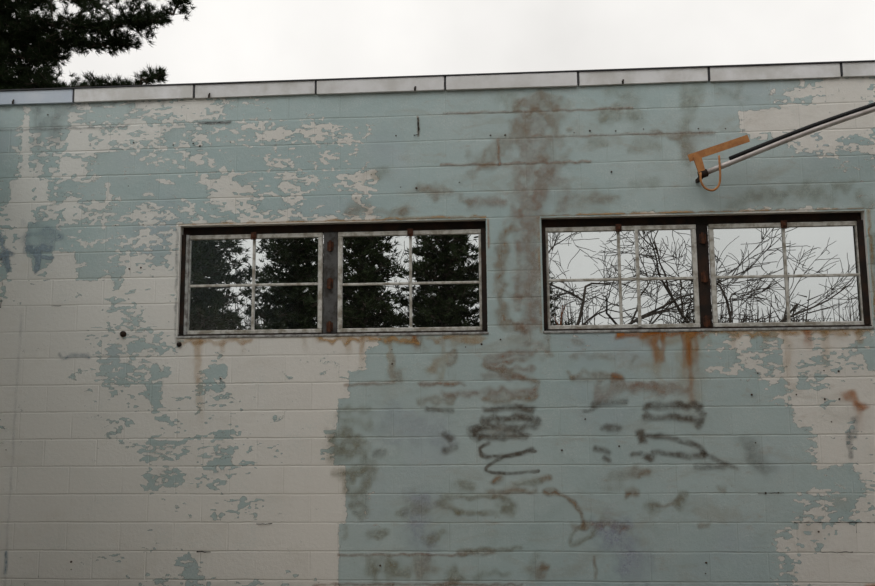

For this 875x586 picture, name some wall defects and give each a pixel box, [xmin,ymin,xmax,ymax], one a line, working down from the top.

peeling [738,79,875,172]
peeling [139,550,264,586]
peeling [0,97,431,520]
peeling [321,337,384,586]
rust [617,332,701,363]
peeling [700,330,875,586]